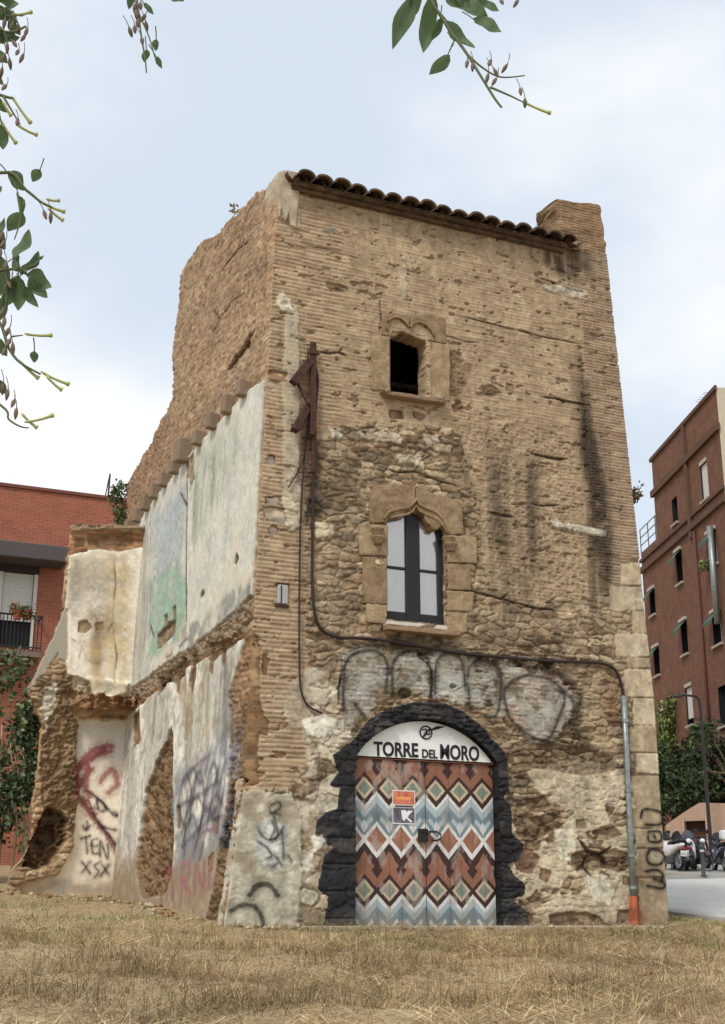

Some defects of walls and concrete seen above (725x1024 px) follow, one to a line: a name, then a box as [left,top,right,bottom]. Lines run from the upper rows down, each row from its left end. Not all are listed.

crack [447,316,573,343]
spalling [78,620,103,633]
spalling [158,607,176,648]
spalling [158,618,253,695]
hole [22,808,67,870]